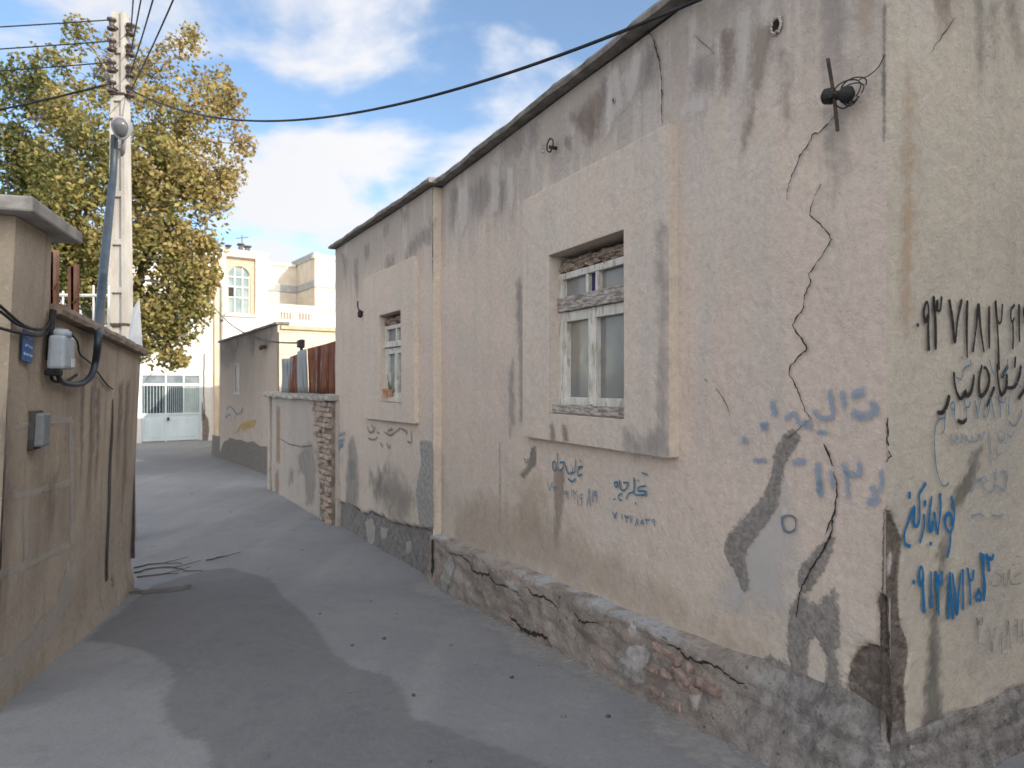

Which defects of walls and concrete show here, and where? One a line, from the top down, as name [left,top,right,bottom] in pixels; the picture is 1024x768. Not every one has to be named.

crack [647,30,663,120]
leakage [450,166,514,234]
crack [787,117,834,190]
crack [787,184,832,438]
crack [796,444,838,617]
crack [431,539,598,647]